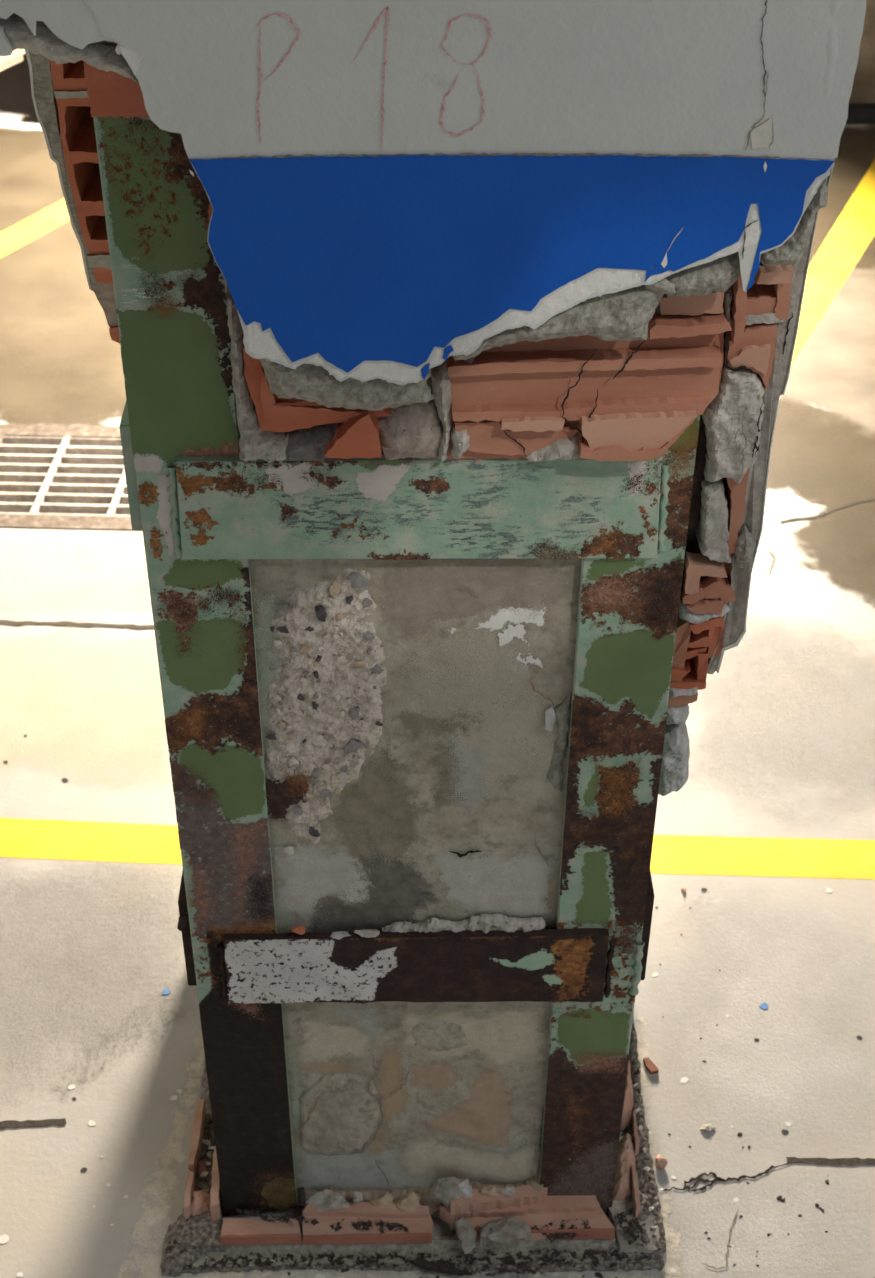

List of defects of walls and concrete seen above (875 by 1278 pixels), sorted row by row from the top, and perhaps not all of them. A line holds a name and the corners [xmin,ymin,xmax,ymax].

spalling [0,14,142,83]
crack [745,0,774,150]
rust [97,117,236,411]
spalling [264,568,387,855]
peeling [475,603,546,668]
spalling [243,172,830,411]
crack [561,340,645,443]
rust [525,430,698,641]
damp [767,235,875,608]
damp [808,124,875,267]
rust [154,566,353,1216]
rust [368,693,667,1215]